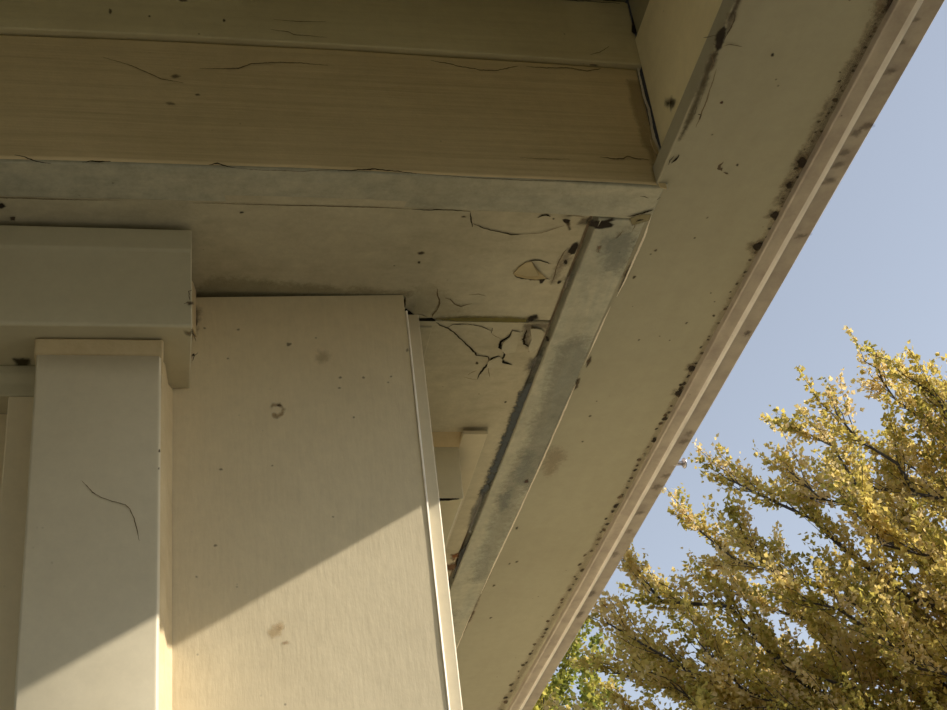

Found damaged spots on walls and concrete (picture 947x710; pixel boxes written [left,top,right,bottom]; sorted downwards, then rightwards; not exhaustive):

crack [107,58,321,83]
damp [682,49,718,134]
crack [218,203,583,235]
damp [736,72,843,285]
crack [419,289,521,379]
damp [453,355,543,579]
crack [82,481,139,539]